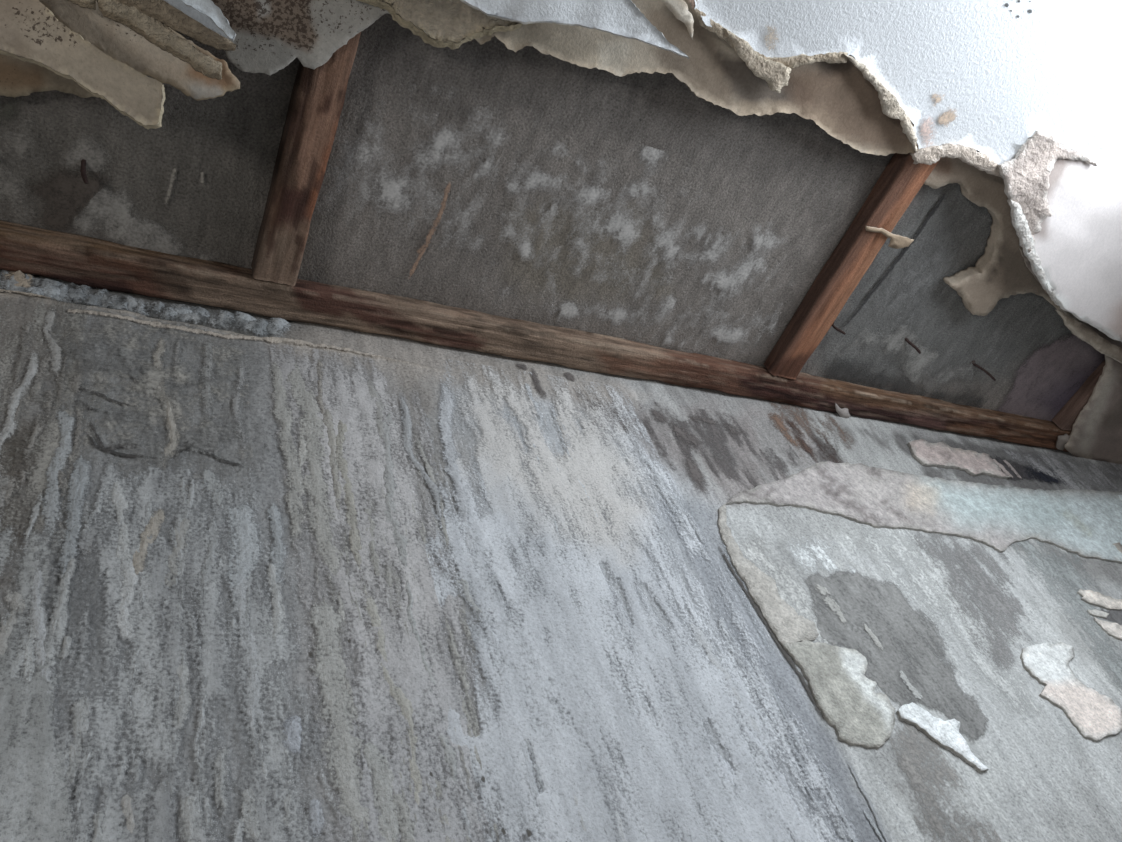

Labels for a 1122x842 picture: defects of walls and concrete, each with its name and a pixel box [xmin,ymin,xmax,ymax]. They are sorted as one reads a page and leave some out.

peeling [659,0,694,39]
water stain [338,111,502,213]
water stain [504,204,557,259]
water stain [507,171,566,192]
water stain [575,146,780,297]
spalling [910,143,1003,179]
water stain [826,325,989,408]
peeling [835,403,850,418]
water stain [0,270,858,842]
peeling [717,439,1122,773]
water stain [890,721,1001,842]